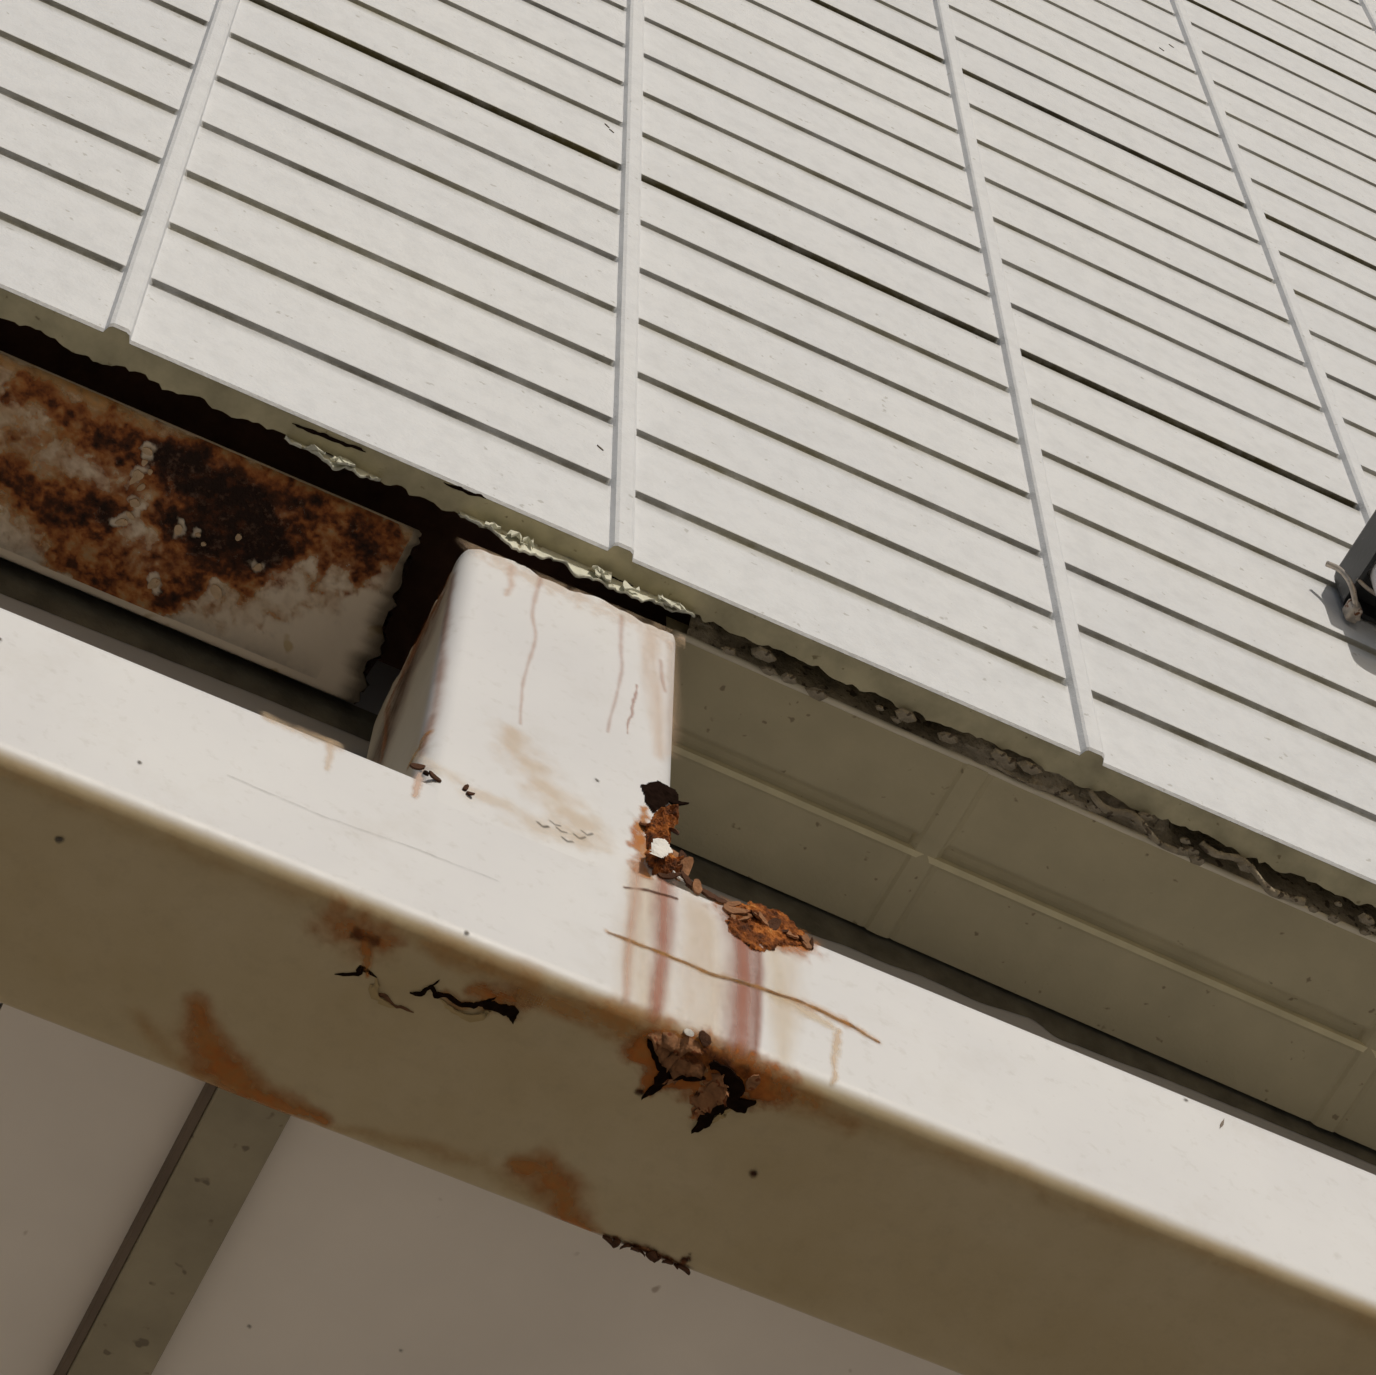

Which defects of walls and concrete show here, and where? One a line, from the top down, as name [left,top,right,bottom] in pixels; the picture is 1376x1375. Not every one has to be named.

rust [0,354,408,617]
peeling [639,821,702,895]
crack [334,965,519,1024]
rust [516,878,668,1039]
rust [685,884,814,1059]
rust [189,1002,329,1125]
rust [509,1160,592,1231]